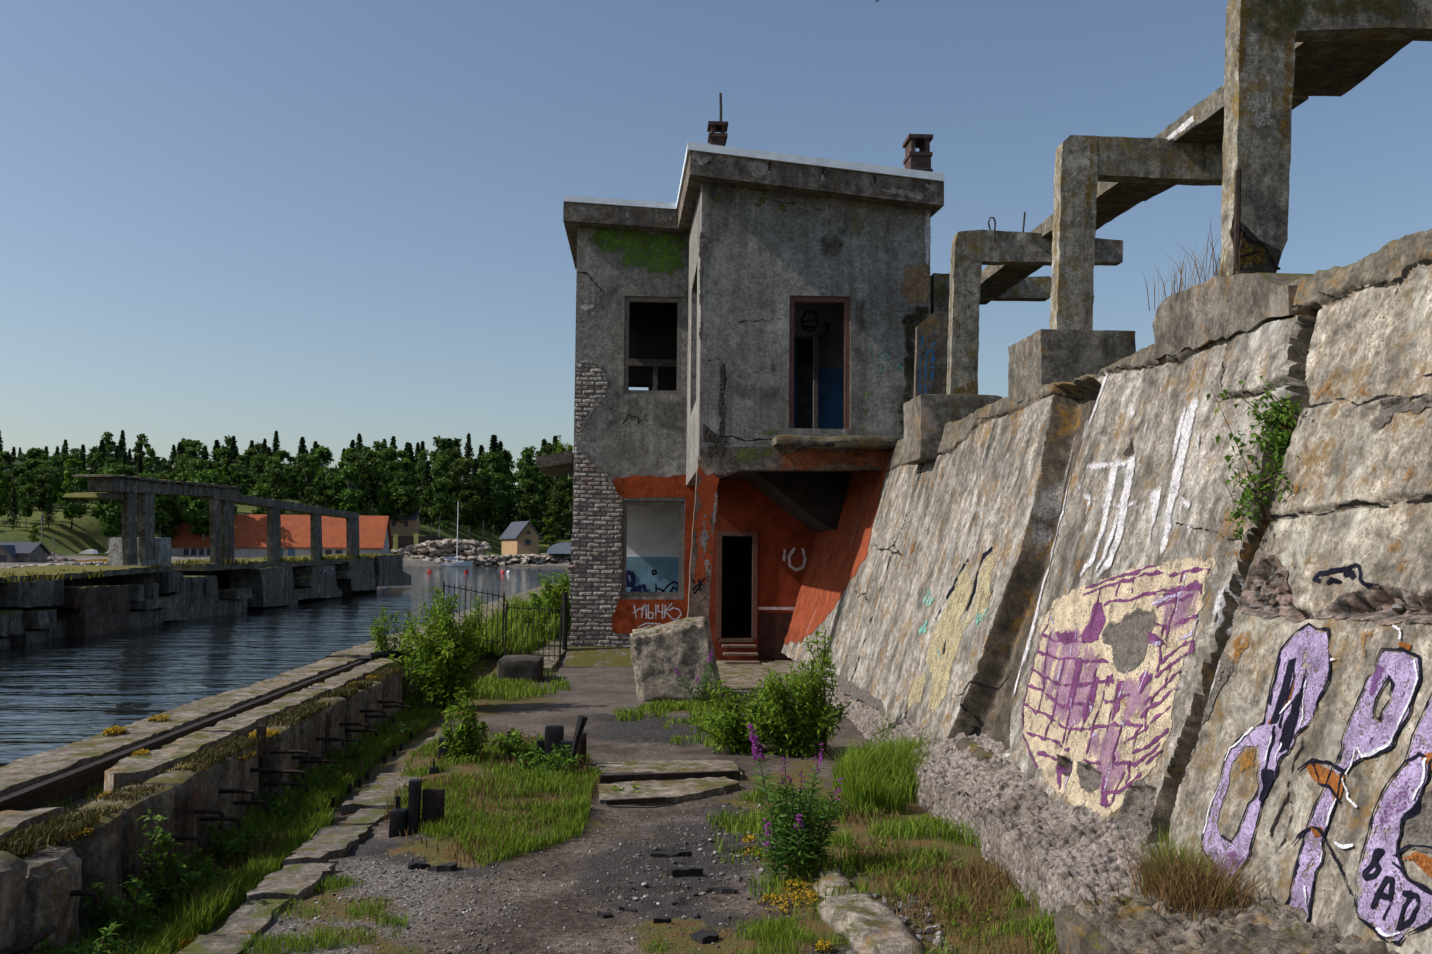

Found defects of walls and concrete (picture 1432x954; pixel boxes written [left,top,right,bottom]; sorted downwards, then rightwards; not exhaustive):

crack [1275,258,1432,319]
peeling [567,360,630,647]
crack [851,392,1084,681]
crack [1270,493,1432,520]
spalling [1239,554,1432,625]